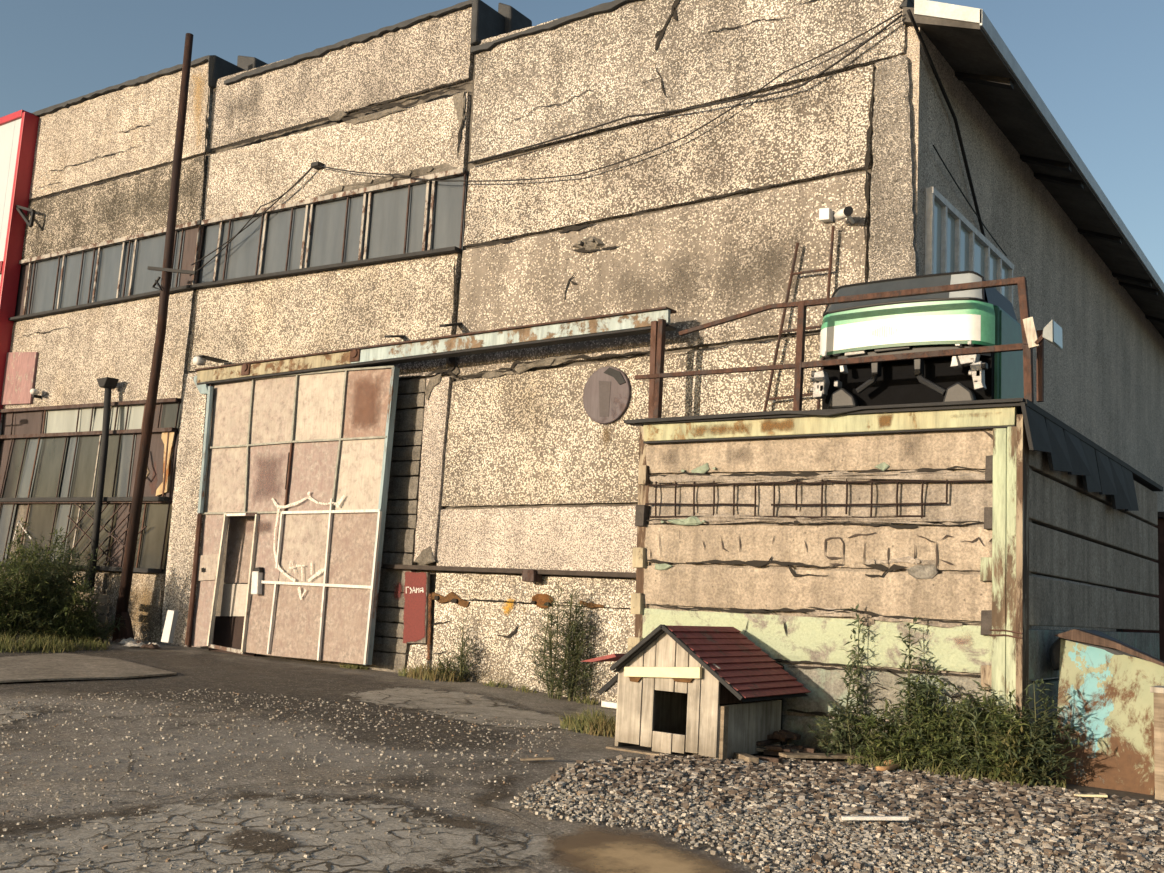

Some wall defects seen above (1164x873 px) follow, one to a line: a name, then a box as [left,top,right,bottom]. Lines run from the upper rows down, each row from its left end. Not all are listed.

crack [705,0,816,34]
crack [640,0,680,97]
corrosion [354,382,377,423]
corrosion [696,426,746,434]
corrosion [761,419,793,431]
corrosion [879,415,892,427]
corrosion [531,594,553,609]